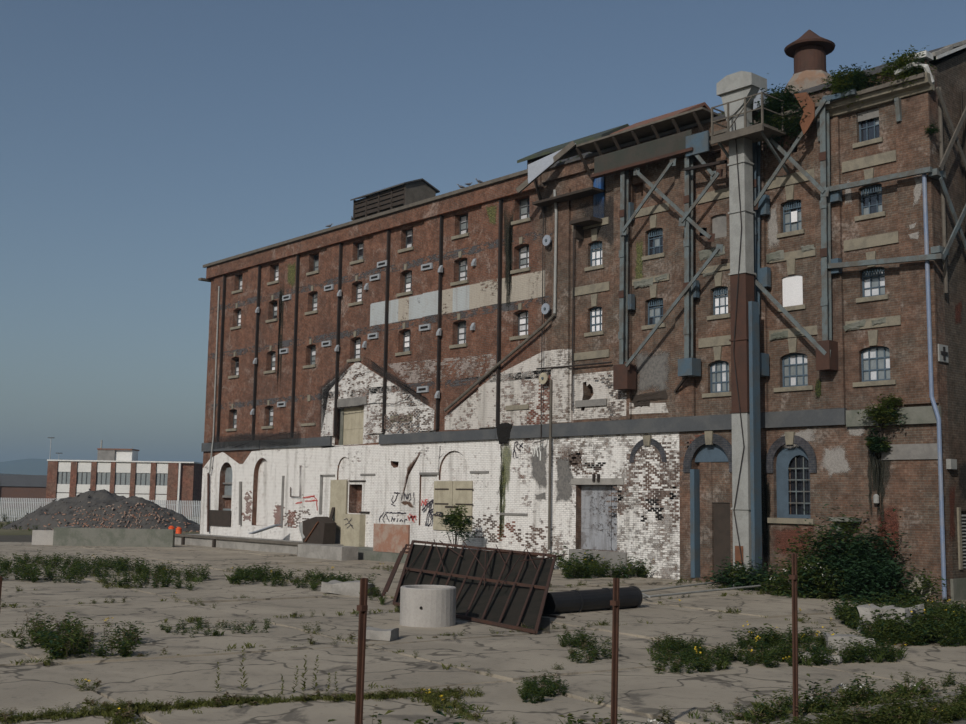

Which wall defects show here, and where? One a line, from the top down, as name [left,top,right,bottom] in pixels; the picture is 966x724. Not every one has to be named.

peeling [367,387,432,434]
spalling [496,423,513,444]
peeling [526,375,551,425]
spalling [531,446,606,501]
peeling [591,431,704,551]